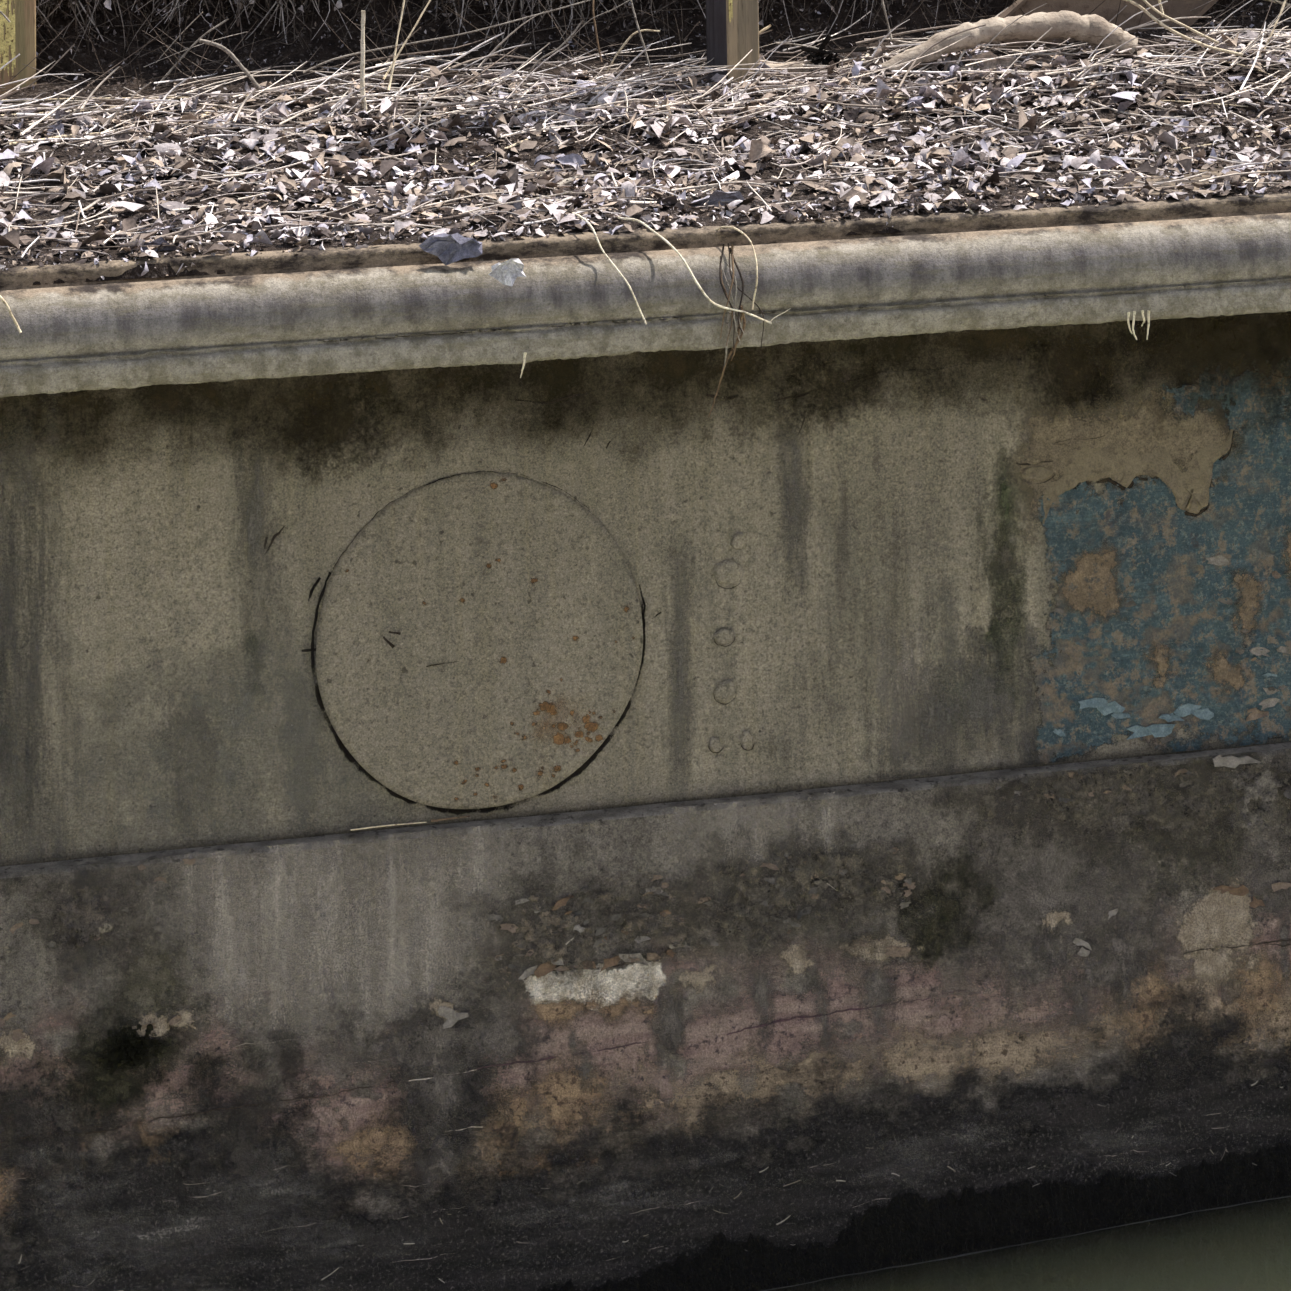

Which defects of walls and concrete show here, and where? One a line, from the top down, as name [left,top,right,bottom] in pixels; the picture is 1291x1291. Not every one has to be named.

corrosion [454,760,524,801]
corrosion [510,678,615,778]
leakage [0,311,1291,863]
spalling [1011,311,1291,835]
leakage [0,633,1291,1291]
peeling [472,831,1118,1133]
spalling [1157,878,1291,1001]